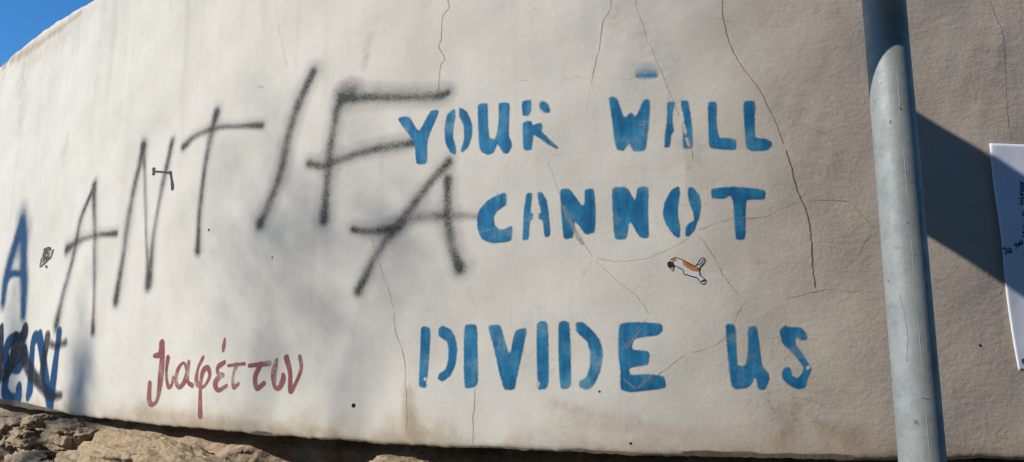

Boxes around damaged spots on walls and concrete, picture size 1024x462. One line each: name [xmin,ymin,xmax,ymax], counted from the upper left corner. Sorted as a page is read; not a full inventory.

crack [548,2,873,387]